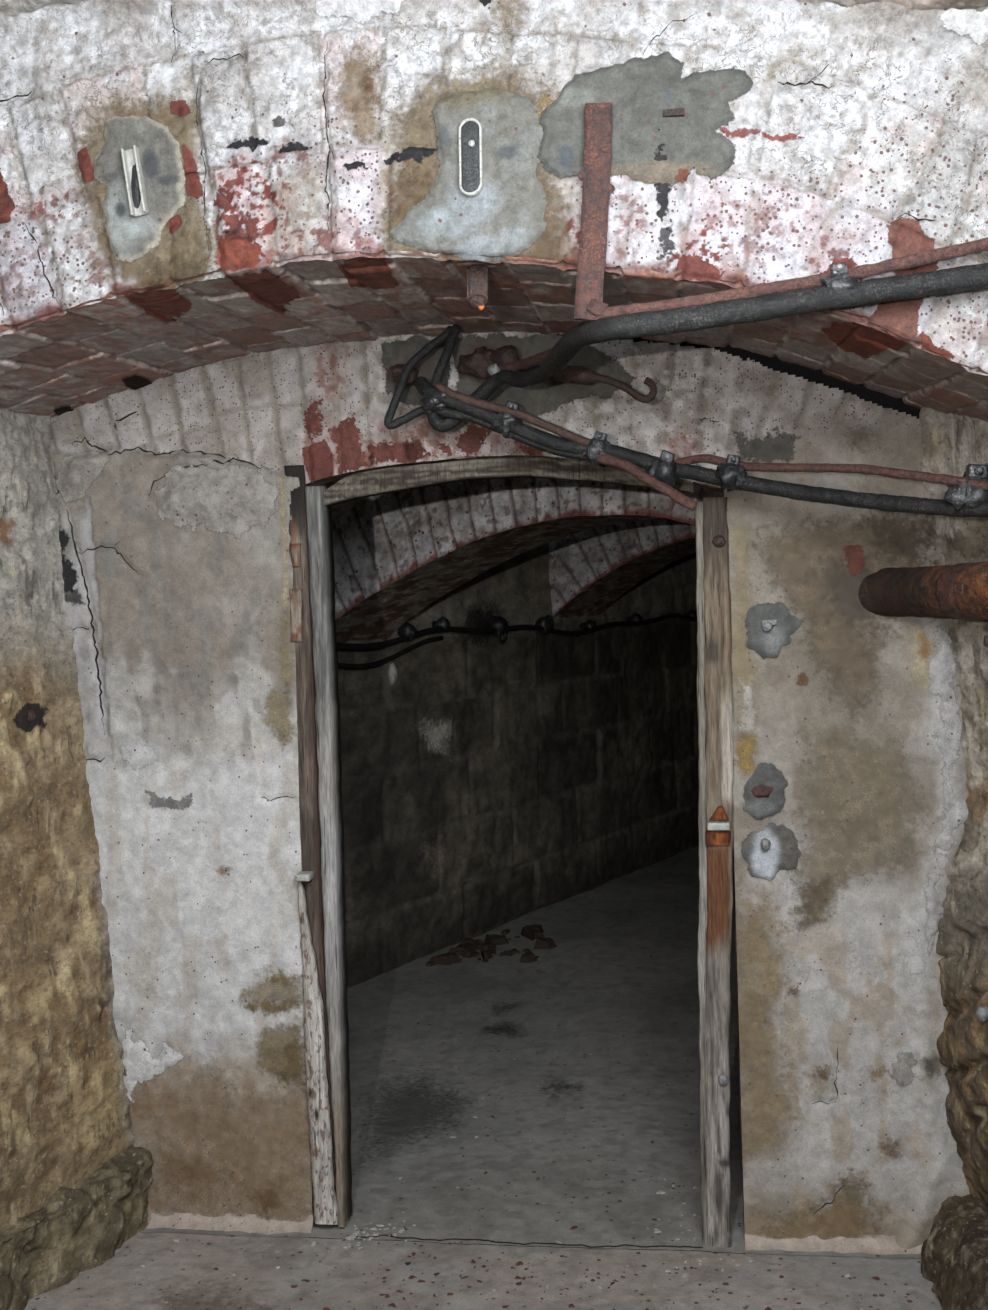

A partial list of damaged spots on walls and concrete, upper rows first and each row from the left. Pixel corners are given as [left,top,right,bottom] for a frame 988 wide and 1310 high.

spalling [170,100,191,117]
spalling [77,147,94,182]
spalling [0,168,15,224]
spalling [167,214,183,233]
peeling [675,251,725,282]
peeling [820,257,859,274]
peeling [888,218,938,276]
peeling [821,298,955,359]
crack [63,411,274,496]
crack [54,476,139,762]
flaking render [145,790,193,810]
damp [130,975,310,1221]